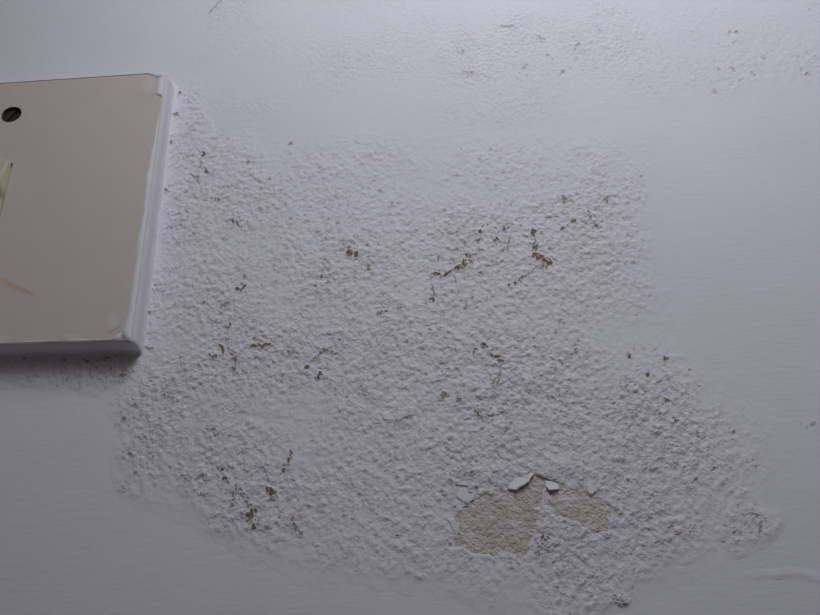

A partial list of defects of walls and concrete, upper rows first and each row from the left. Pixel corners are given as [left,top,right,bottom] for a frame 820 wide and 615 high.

peeling [445,469,611,559]